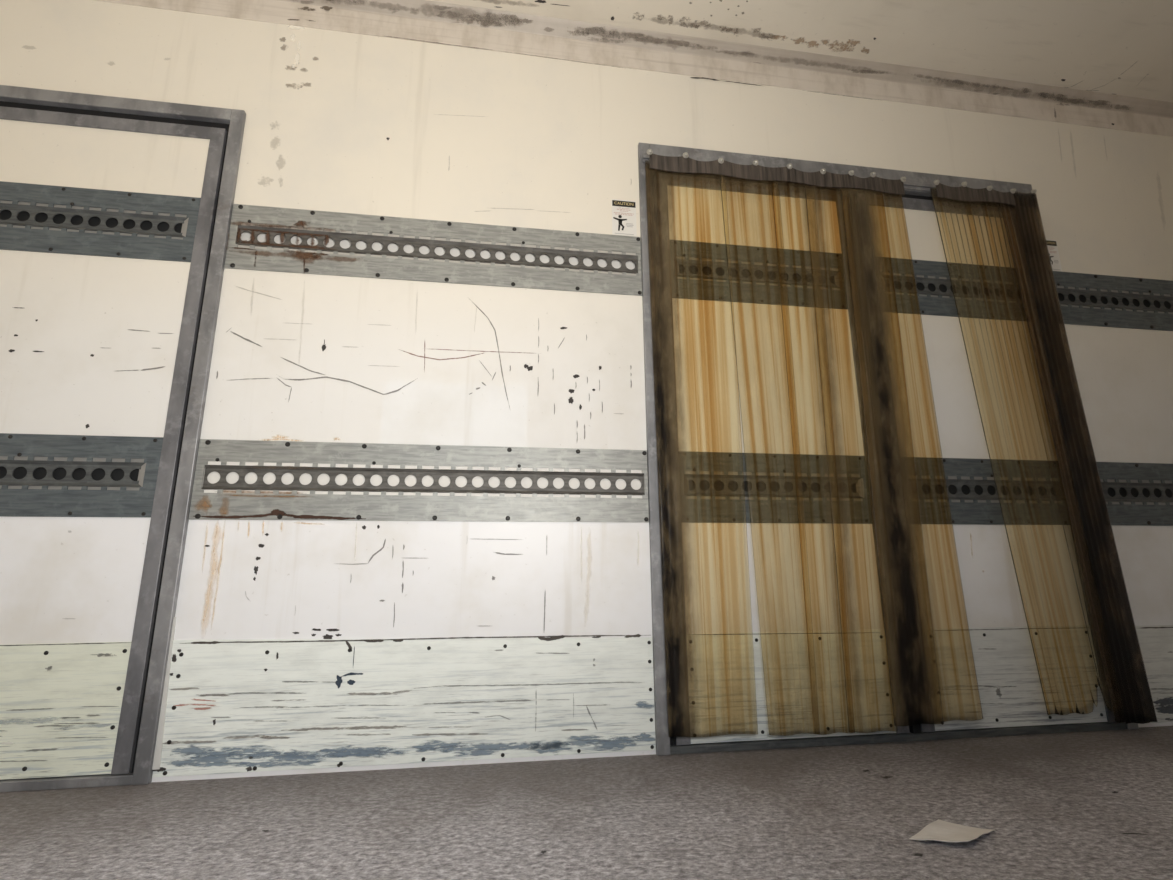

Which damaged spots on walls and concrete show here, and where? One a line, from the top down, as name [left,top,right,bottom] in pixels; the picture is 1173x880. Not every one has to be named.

water stain [773,35,869,53]
corrosion [229,221,356,273]